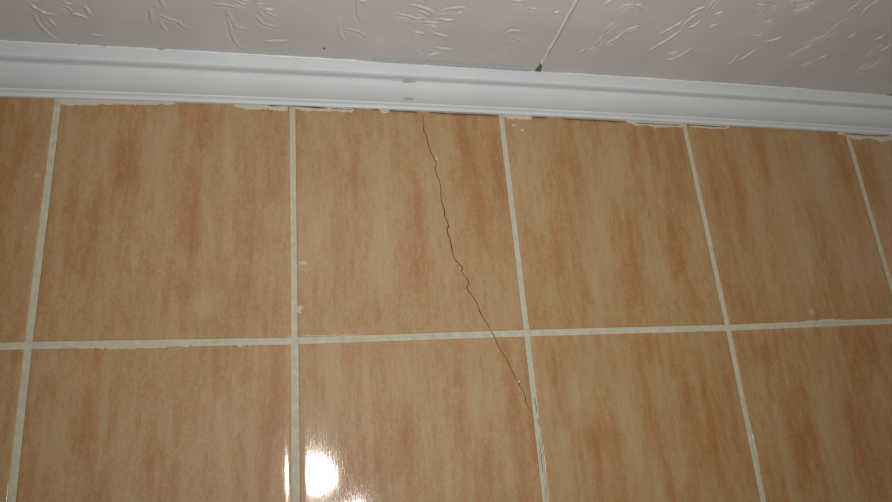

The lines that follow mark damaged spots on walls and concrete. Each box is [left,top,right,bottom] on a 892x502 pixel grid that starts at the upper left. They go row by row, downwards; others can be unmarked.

crack [423,118,546,497]